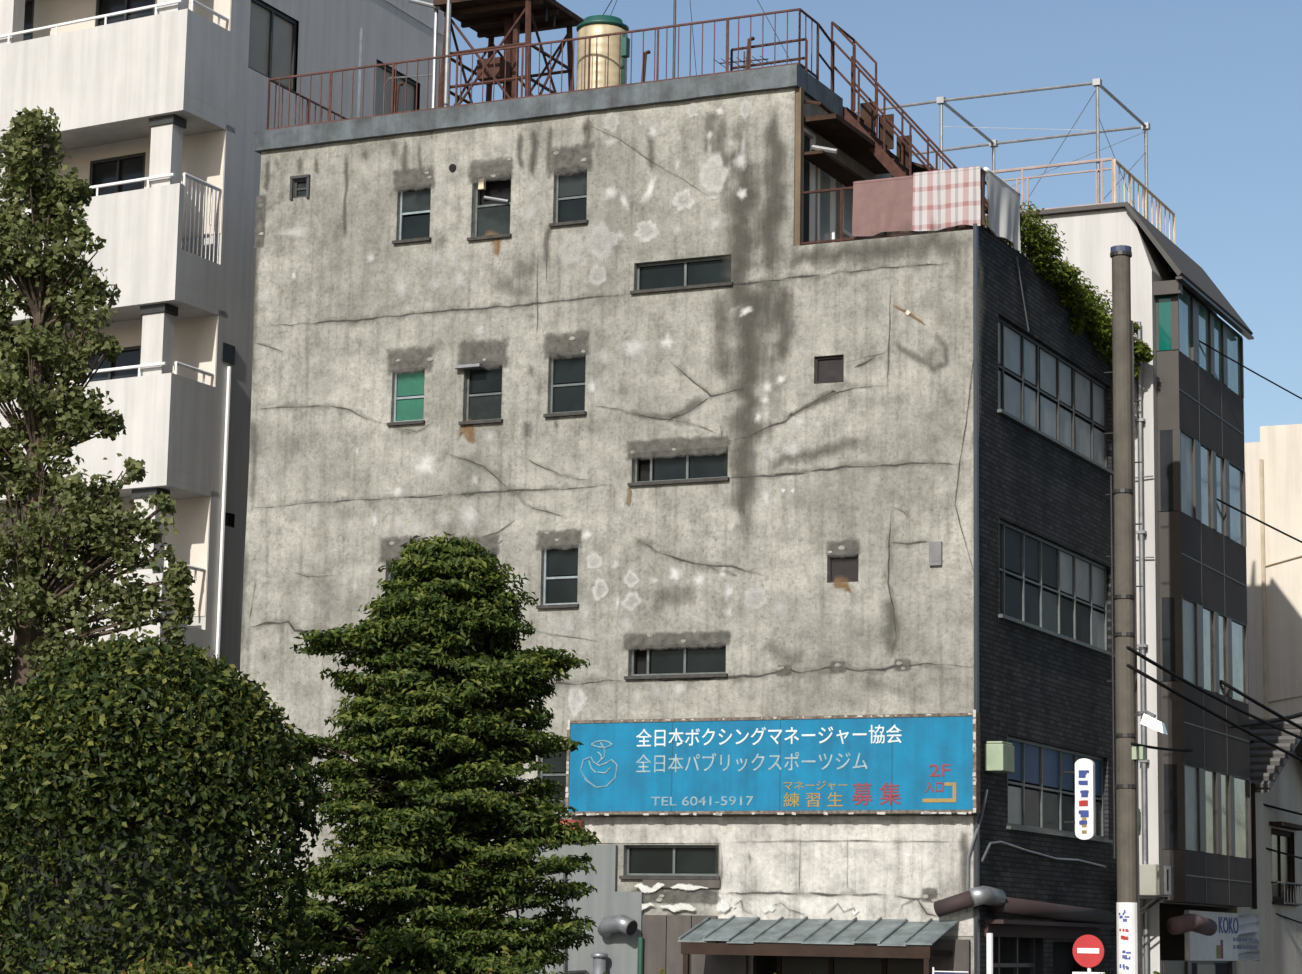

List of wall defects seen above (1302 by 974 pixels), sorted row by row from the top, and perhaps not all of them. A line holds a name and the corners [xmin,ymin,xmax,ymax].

damp [518,133,536,171]
crack [257,248,618,350]
damp [728,119,785,516]
crack [601,263,946,440]
damp [779,291,789,357]
crack [256,455,605,544]
corrosion [461,425,474,442]
crack [730,364,974,572]
crack [250,583,331,632]
crack [554,511,958,684]